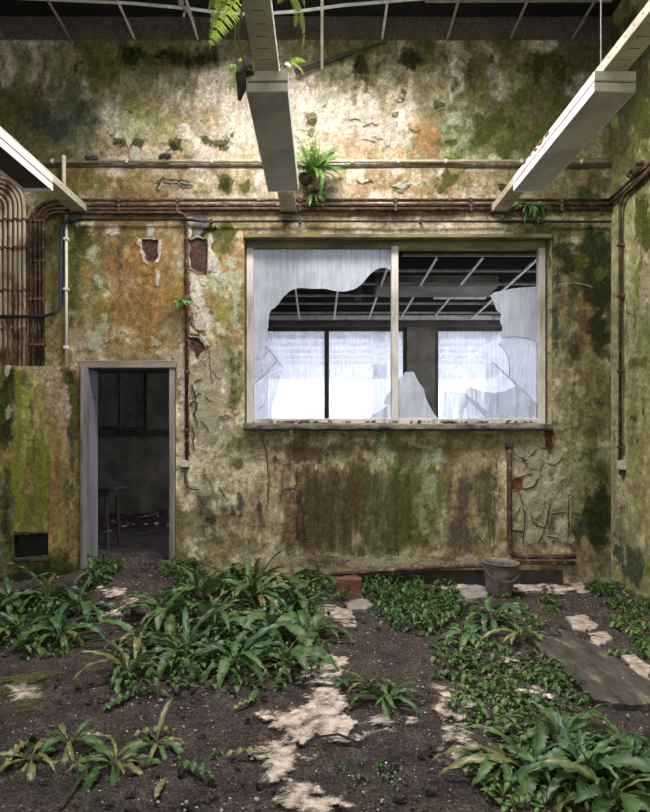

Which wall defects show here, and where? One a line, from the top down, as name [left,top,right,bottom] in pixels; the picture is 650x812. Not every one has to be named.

crack [155,177,194,190]
spalling [137,222,163,286]
peeling [169,223,238,444]
crack [188,303,233,452]
crack [262,432,305,539]
leakage [273,441,479,570]
crack [480,446,575,552]
rust [545,430,554,456]